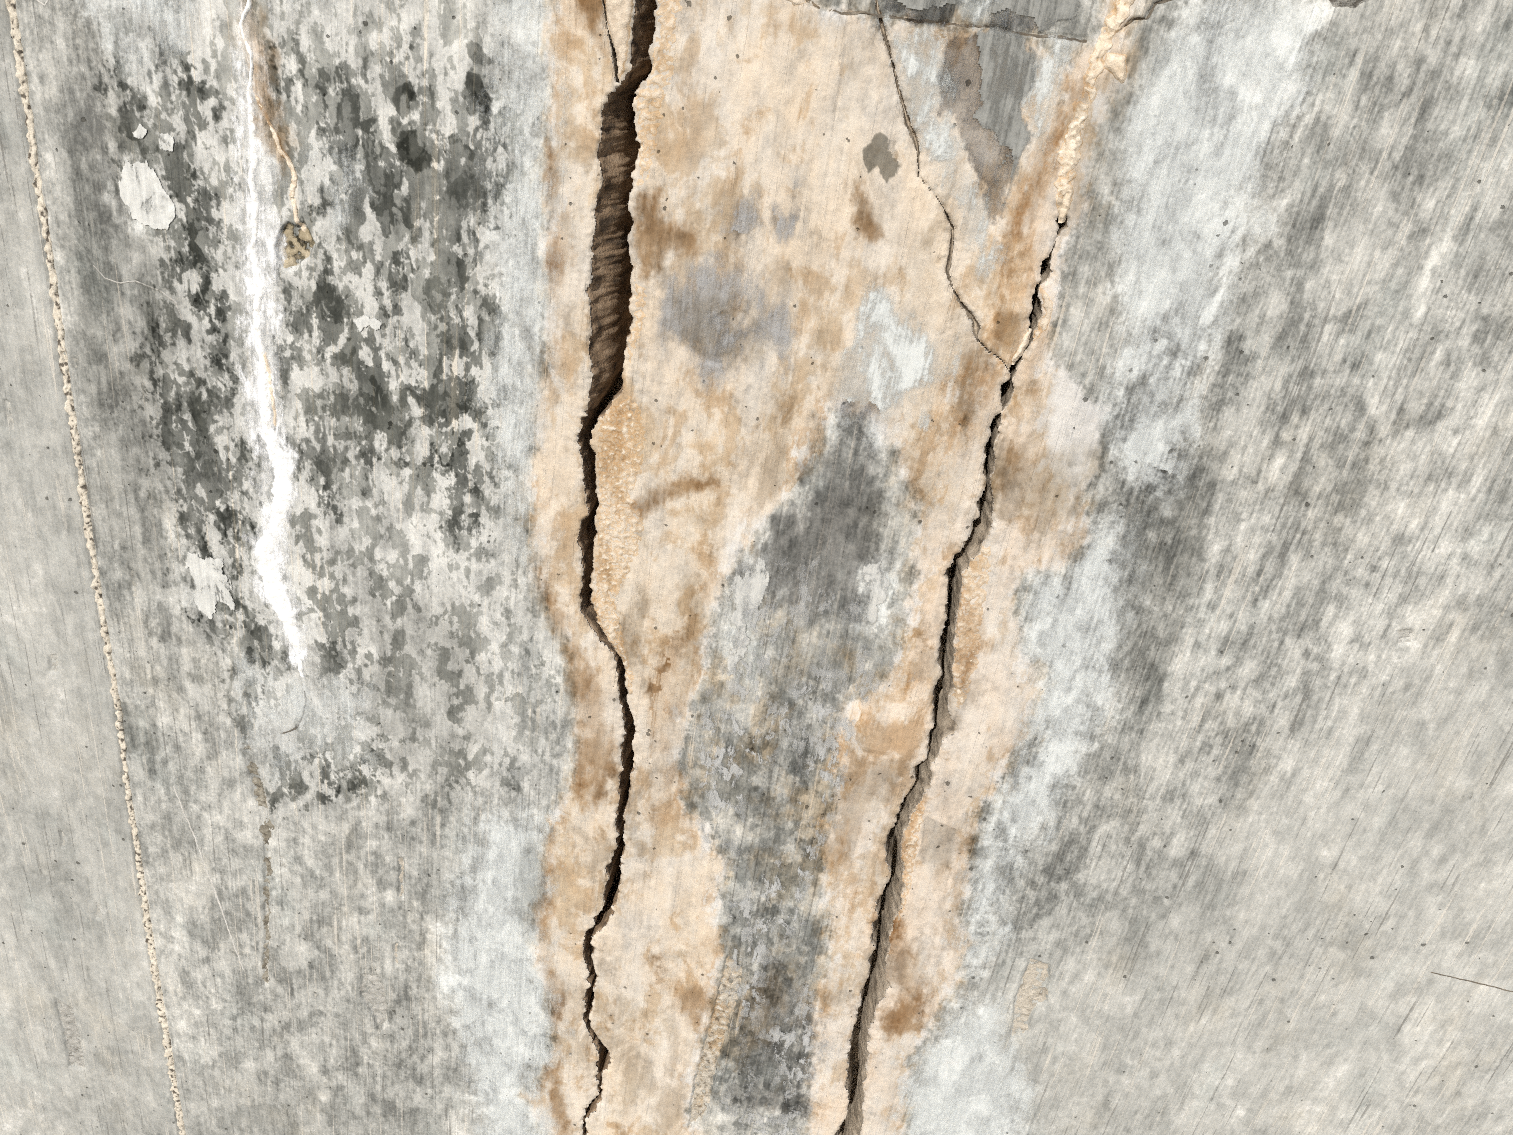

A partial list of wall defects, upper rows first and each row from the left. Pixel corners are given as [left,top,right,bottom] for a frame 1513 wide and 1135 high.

water stain [334,92,411,233]
water stain [483,100,520,163]
water stain [132,0,312,734]
water stain [326,303,388,421]
water stain [403,334,533,490]
crack [577,0,683,1135]
crack [834,0,1068,1135]
water stain [319,767,341,805]